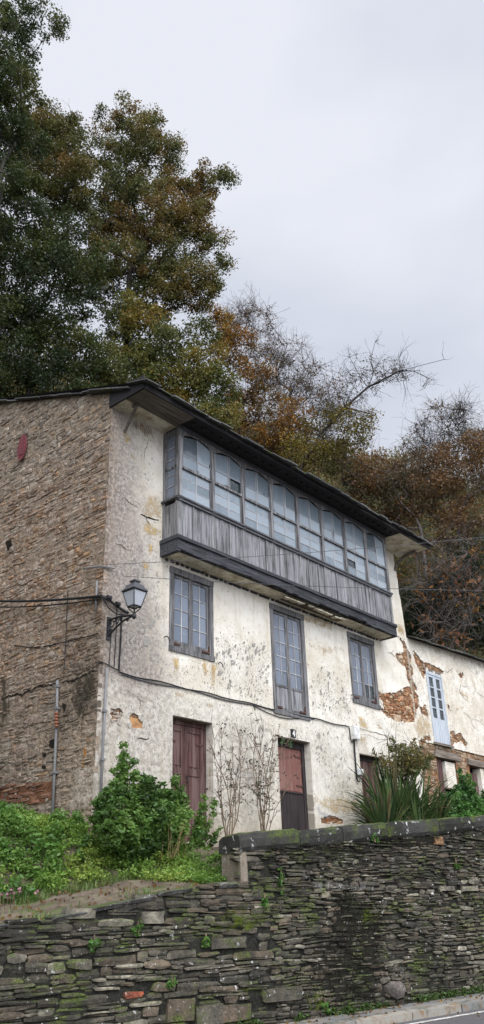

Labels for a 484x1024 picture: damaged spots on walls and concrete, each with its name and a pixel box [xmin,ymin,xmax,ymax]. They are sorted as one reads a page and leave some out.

flaking render [373,636,444,724]
flaking render [110,708,145,728]
flaking render [449,731,467,750]
flaking render [318,808,343,826]